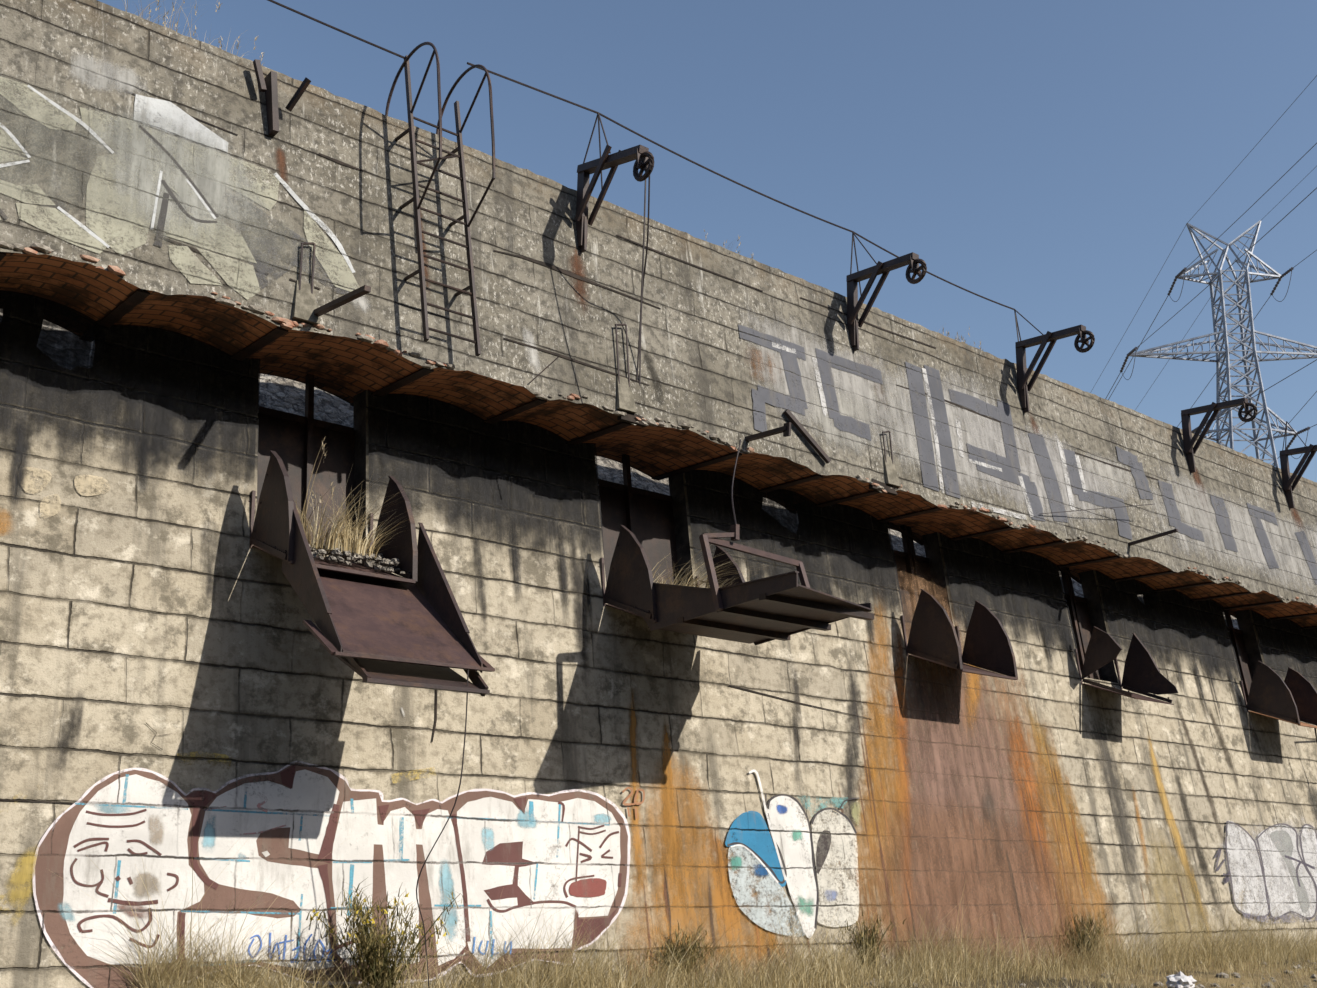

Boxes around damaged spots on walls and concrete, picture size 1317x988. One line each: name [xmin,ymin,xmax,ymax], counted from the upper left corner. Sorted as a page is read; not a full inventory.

damp [59,708,83,763]
rust [629,706,784,975]
rust [839,610,1107,967]